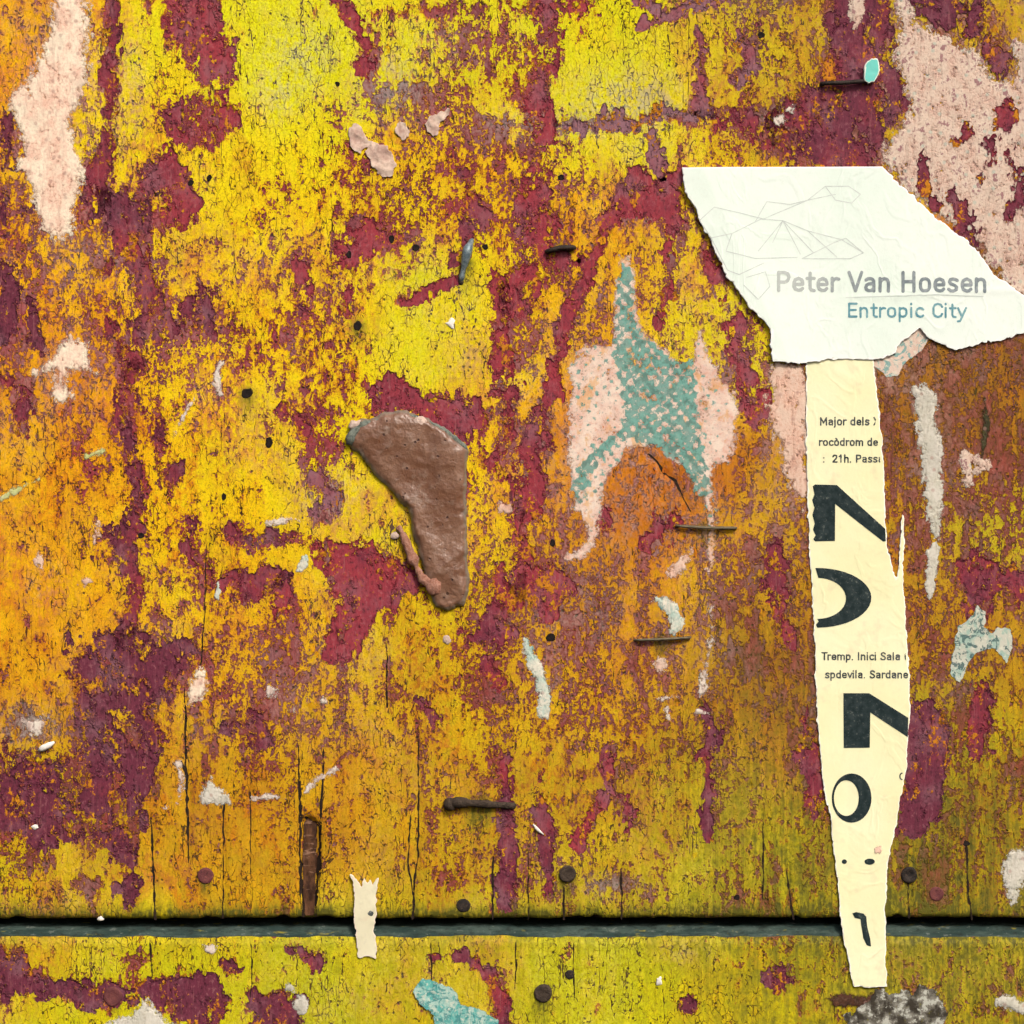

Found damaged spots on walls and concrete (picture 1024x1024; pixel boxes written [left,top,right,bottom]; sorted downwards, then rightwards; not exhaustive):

peeling [910,0,1020,80]
peeling [915,147,982,249]
peeling [949,96,1024,223]
peeling [367,0,913,694]
peeling [0,0,251,913]
crack [648,454,691,512]
crack [149,819,157,977]
crack [181,687,190,863]
crack [222,790,252,919]
crack [297,745,324,917]
peeling [787,700,829,823]
peeling [894,676,998,840]